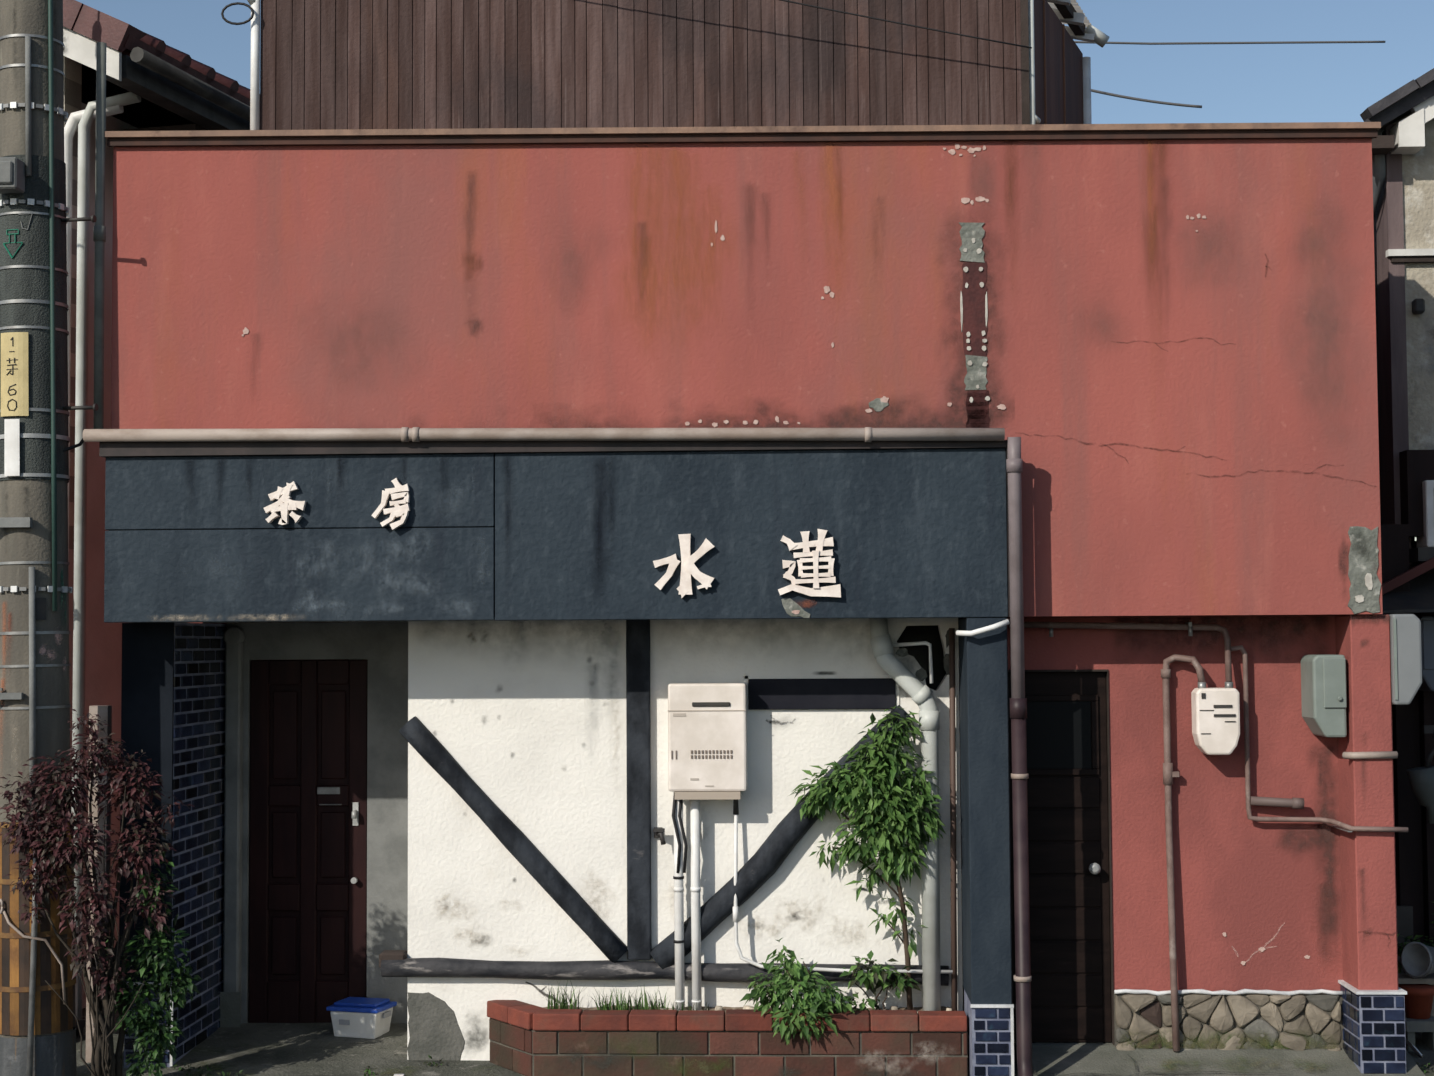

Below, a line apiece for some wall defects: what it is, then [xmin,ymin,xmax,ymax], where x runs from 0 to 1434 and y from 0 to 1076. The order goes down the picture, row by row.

peeling [685,416,800,428]
spalling [1340,526,1381,614]
peeling [407,992,481,1061]